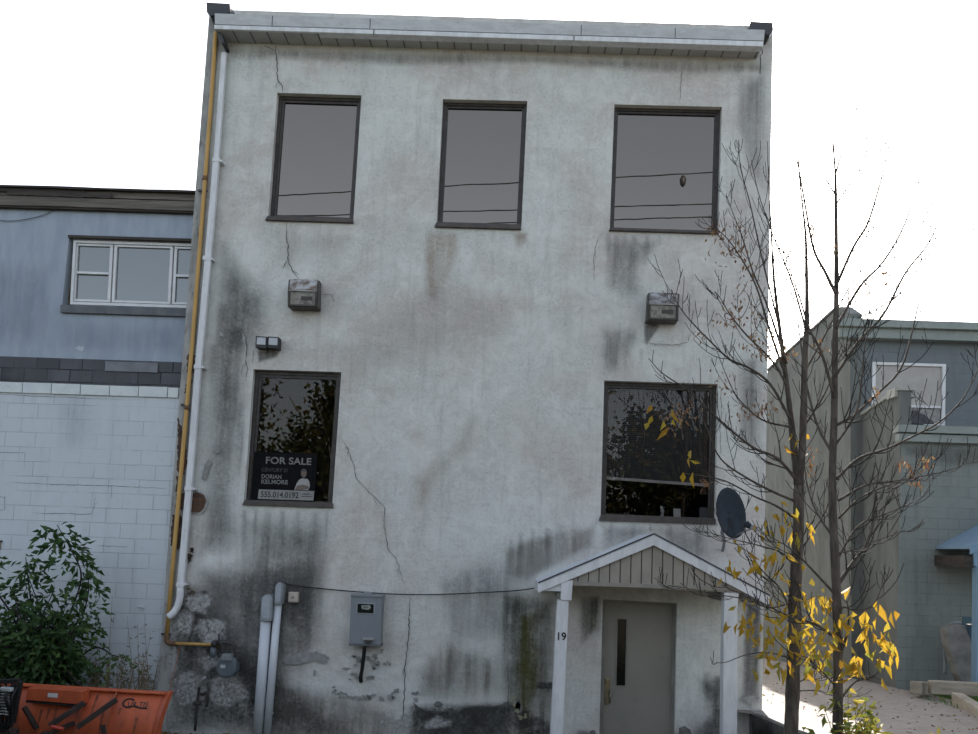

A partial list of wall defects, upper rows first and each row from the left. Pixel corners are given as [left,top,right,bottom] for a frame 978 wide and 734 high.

crack [283,224,299,279]
water stain [219,278,257,424]
peeling [168,588,249,707]
water stain [173,535,332,731]
peeling [332,686,399,701]
peeling [342,649,391,680]
crack [339,436,411,732]
flaking render [379,691,527,734]
water stain [411,601,552,734]